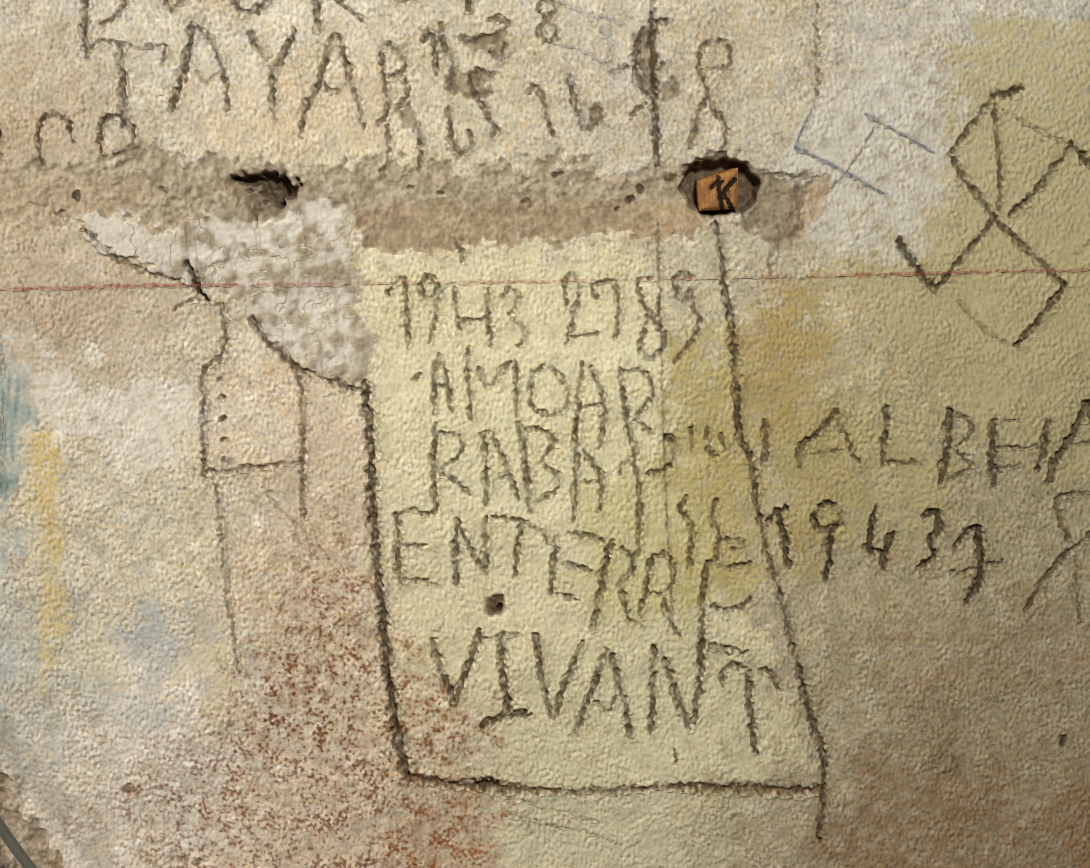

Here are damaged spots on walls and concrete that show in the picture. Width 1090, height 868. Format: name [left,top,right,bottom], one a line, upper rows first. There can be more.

flaking render [0,139,833,397]